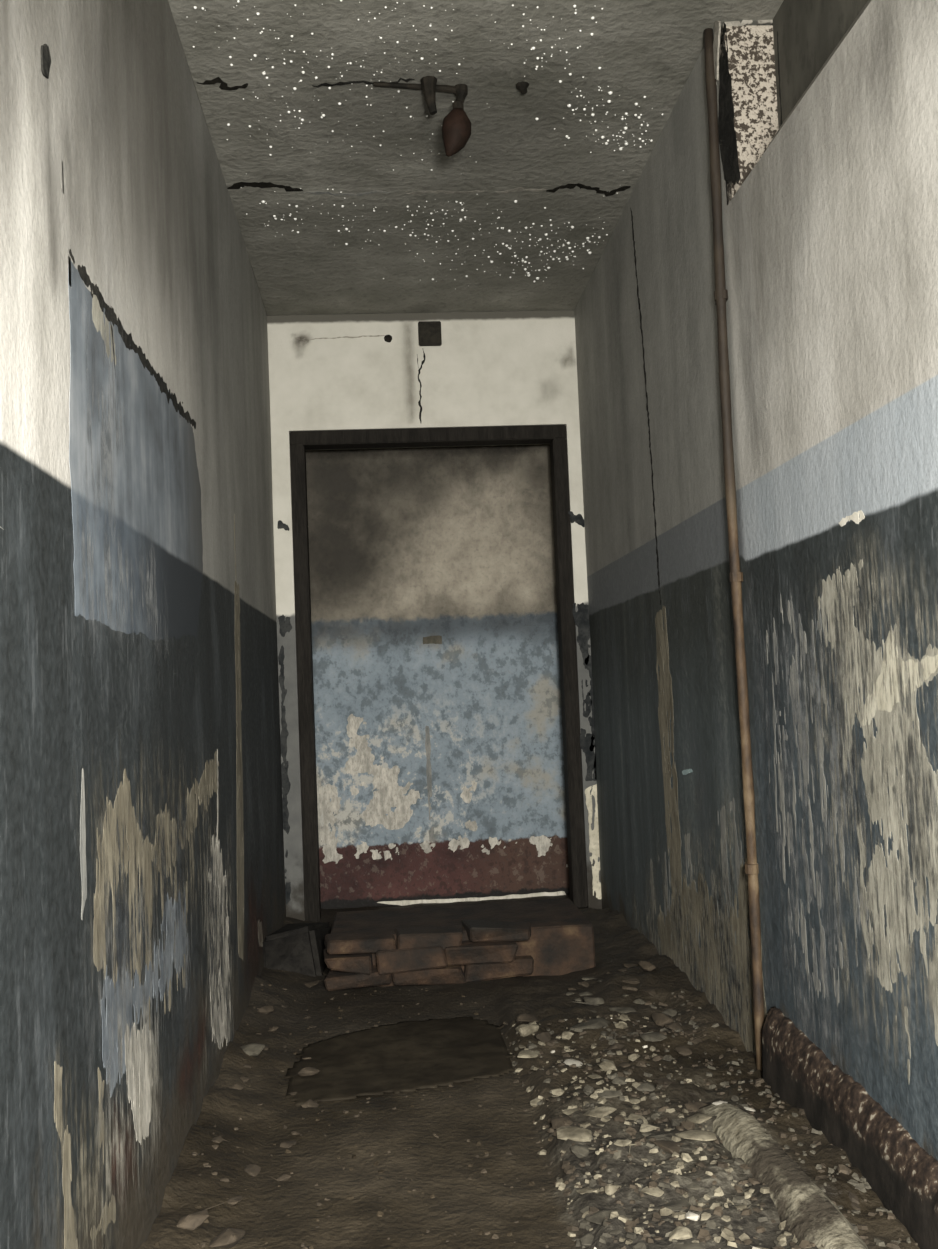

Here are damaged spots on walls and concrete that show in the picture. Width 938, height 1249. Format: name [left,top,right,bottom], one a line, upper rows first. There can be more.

crack [197,77,248,91]
crack [227,182,303,192]
peeling [92,294,116,365]
crack [417,351,425,423]
crack [546,183,661,605]
peeling [839,510,865,527]
peeling [317,714,553,864]
peeling [759,560,938,1083]
peeling [54,516,263,1249]